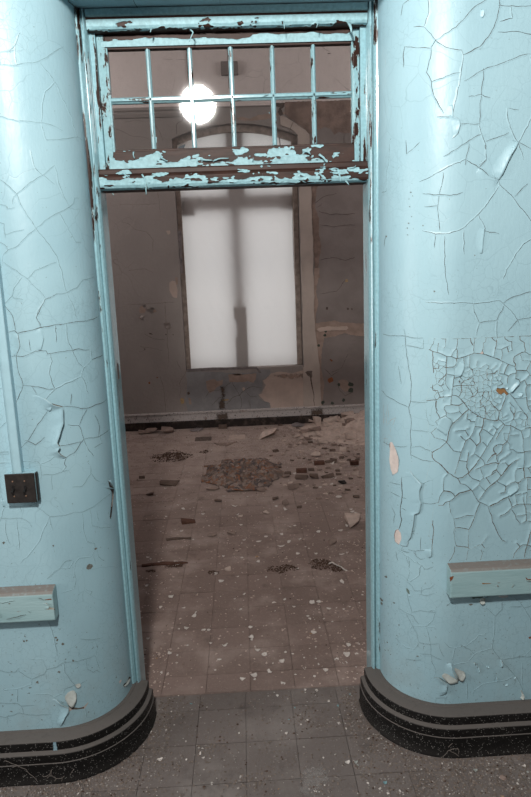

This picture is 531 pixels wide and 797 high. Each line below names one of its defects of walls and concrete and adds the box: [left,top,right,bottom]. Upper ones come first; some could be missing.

peeling [84,2,368,47]
crack [400,0,531,340]
crack [0,33,112,596]
spalling [99,100,368,412]
crack [382,331,433,484]
peeling [389,335,531,562]
crack [0,621,125,724]
peeling [52,683,88,726]
crack [396,531,456,677]
peeling [434,663,465,696]